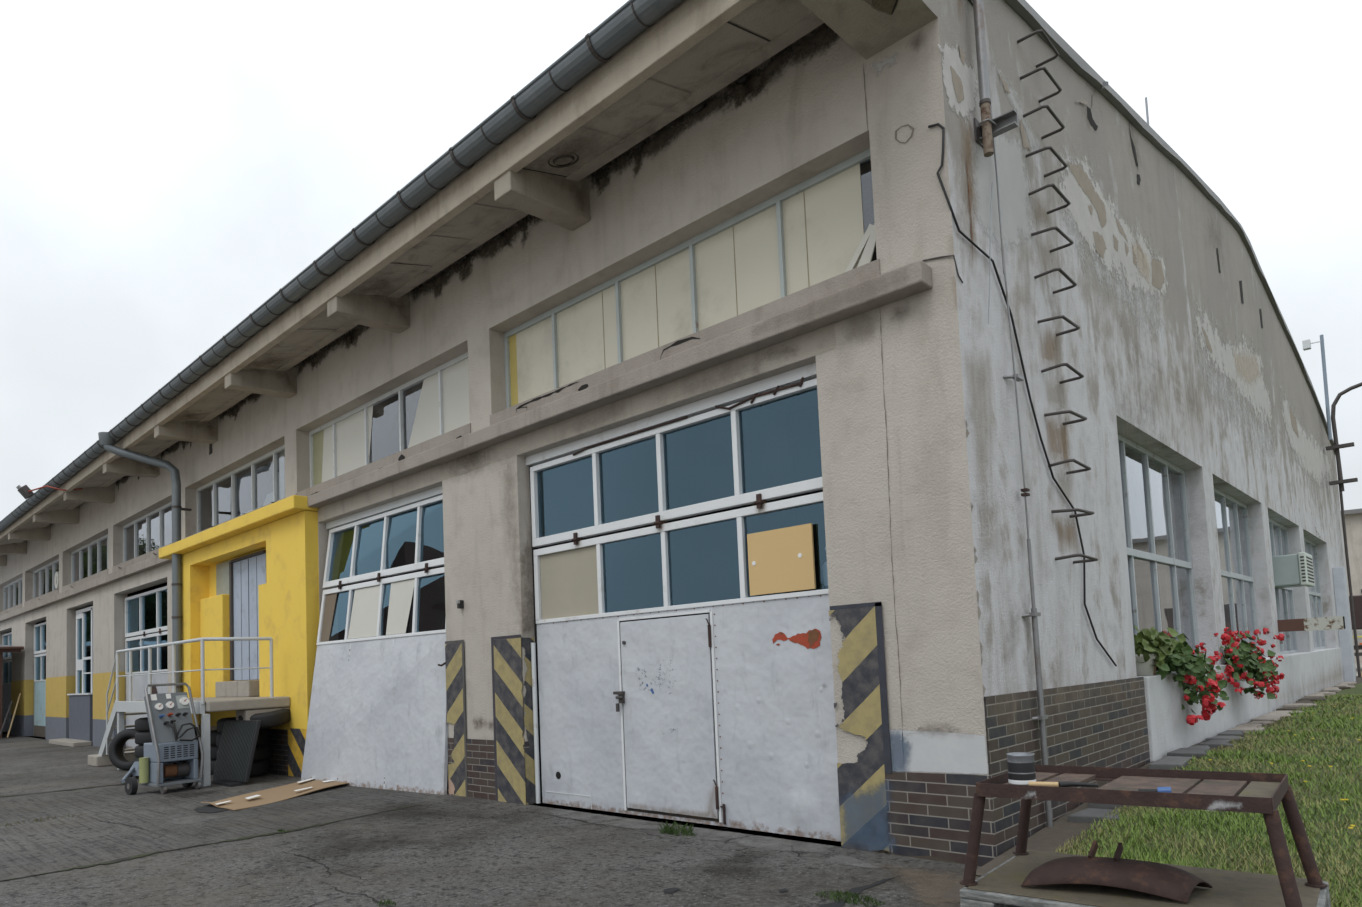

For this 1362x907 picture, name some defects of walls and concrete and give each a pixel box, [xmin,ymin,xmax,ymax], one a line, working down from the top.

leakage [576,23,838,204]
peeling [938,42,978,124]
peeling [999,71,1039,151]
spalling [1076,99,1098,130]
leakage [411,216,542,300]
peeling [1057,152,1168,330]
leakage [293,324,369,376]
peeling [1194,302,1331,494]